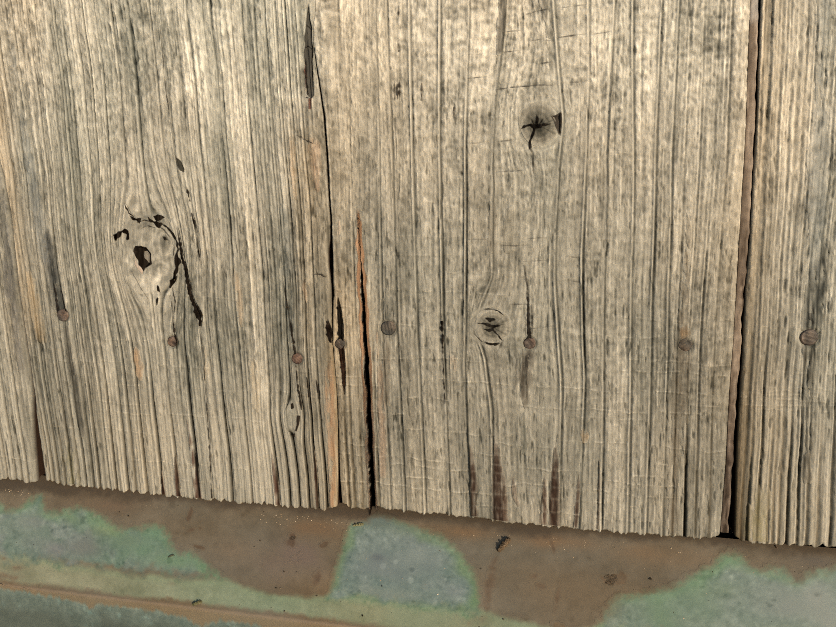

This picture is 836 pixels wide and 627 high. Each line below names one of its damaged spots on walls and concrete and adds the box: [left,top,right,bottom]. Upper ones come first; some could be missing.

crack [506,116,549,170]
crack [125,189,203,348]
crack [325,214,378,514]
crack [205,389,213,499]